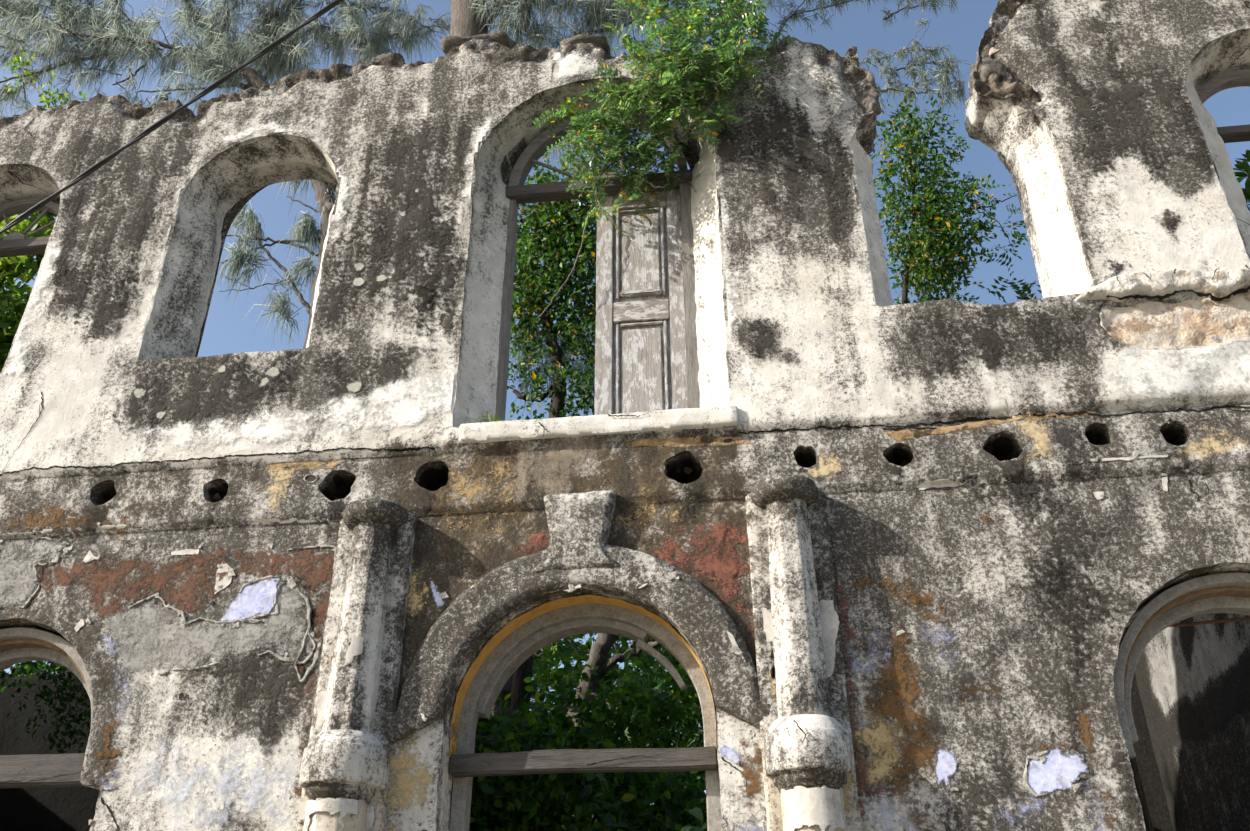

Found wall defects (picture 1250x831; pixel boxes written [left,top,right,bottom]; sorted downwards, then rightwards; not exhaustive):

damp [717,97,856,244]
damp [1023,0,1233,220]
damp [108,101,497,450]
spalling [1100,291,1250,350]
crack [0,392,435,476]
flaking render [0,529,336,757]
peeling [344,636,364,666]
peeling [653,520,776,695]
damp [958,416,1136,777]
peeling [293,775,358,831]
peeling [1023,746,1087,797]
damp [1111,731,1142,831]